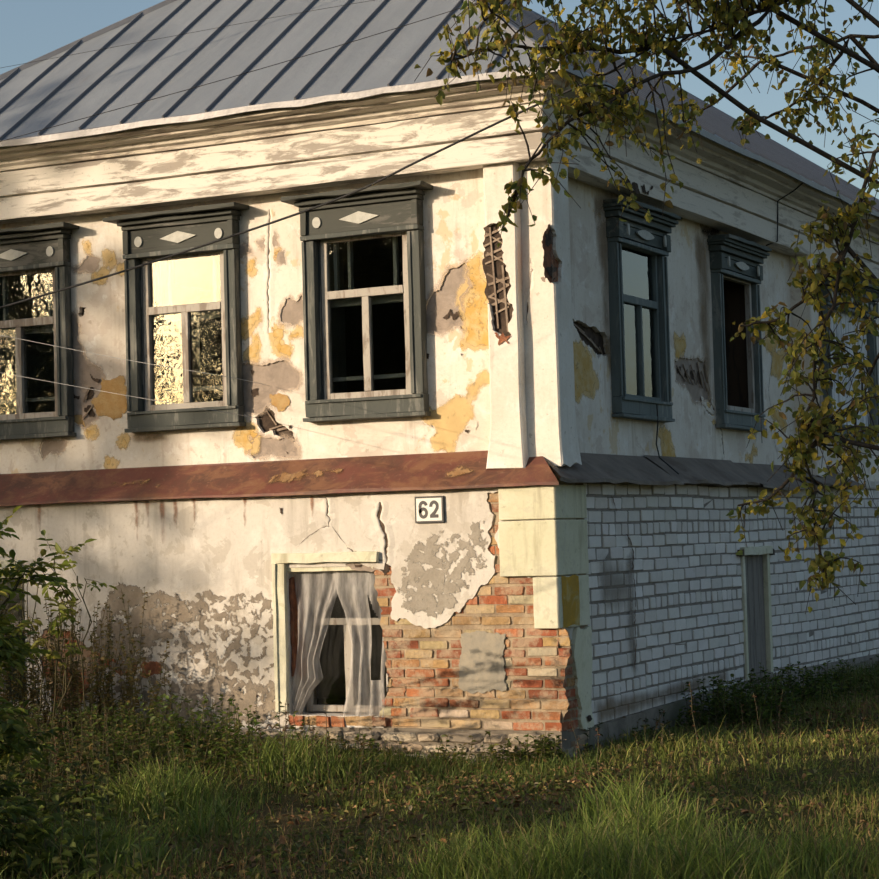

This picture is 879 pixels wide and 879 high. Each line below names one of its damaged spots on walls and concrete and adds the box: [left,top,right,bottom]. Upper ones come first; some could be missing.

crack [262,209,277,334]
spalling [426,252,511,356]
spalling [541,224,559,283]
spalling [71,307,127,440]
spalling [233,295,304,459]
peeling [422,370,490,452]
spalling [573,322,605,403]
rust [268,468,342,483]
rust [446,466,473,477]
crack [300,494,395,570]
peeling [41,582,309,734]
flaking render [346,492,592,740]